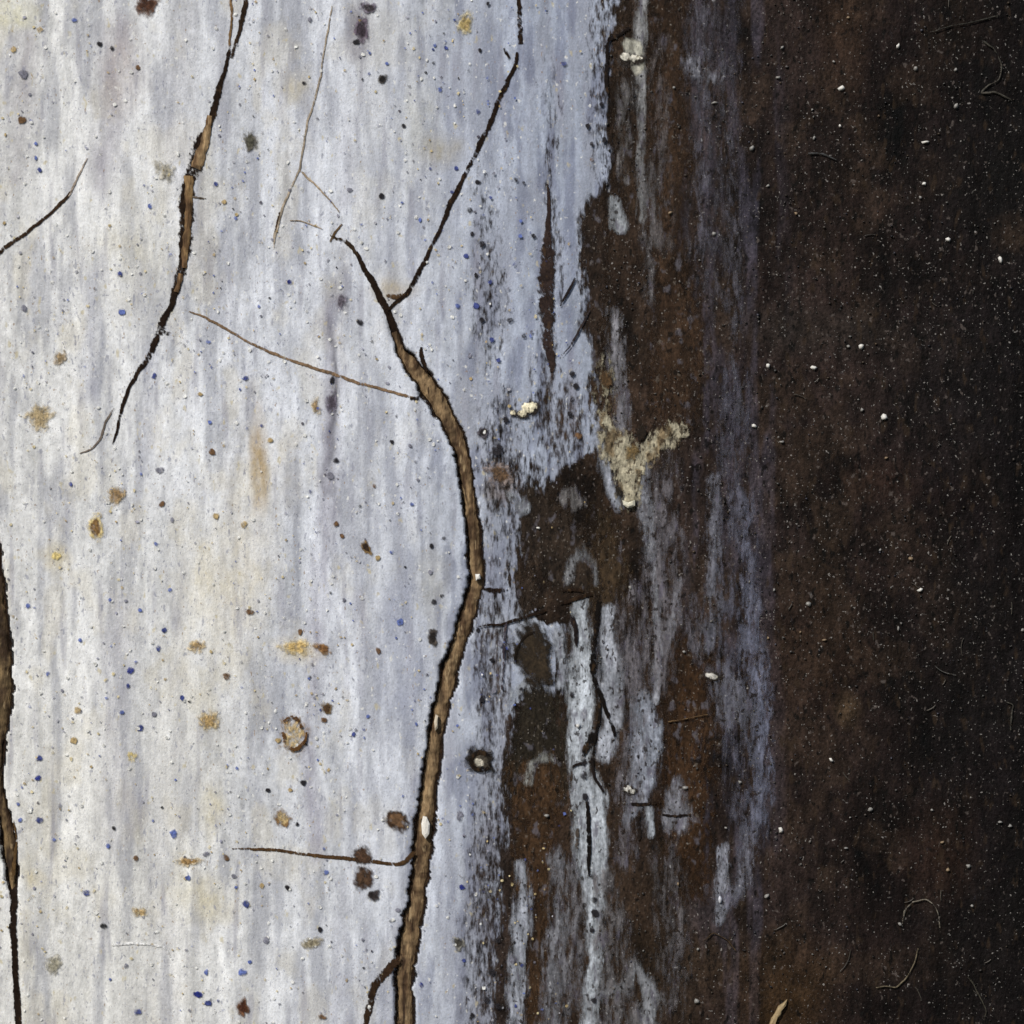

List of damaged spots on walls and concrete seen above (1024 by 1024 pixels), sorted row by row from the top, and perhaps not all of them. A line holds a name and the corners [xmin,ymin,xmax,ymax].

crack [0,158,88,254]
peeling [610,196,627,234]
peeling [617,0,672,301]
peeling [685,0,741,336]
crack [0,544,22,1024]
crack [80,0,616,1024]
hole [464,746,495,774]
peeling [505,309,773,1024]
damp [464,0,1024,1024]